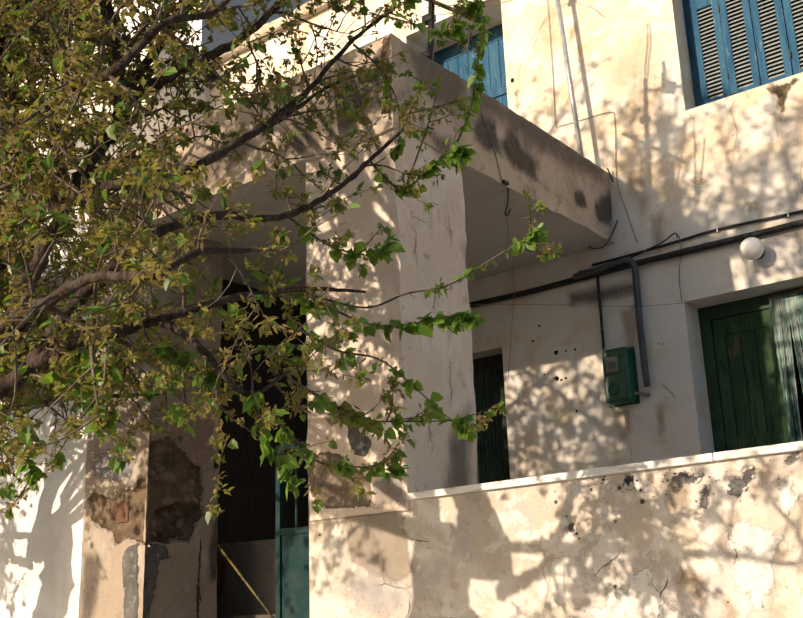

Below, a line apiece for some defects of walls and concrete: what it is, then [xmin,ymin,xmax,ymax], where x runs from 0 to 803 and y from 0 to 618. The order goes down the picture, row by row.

damp [767,78,797,112]
damp [475,92,602,178]
damp [575,192,586,207]
damp [596,193,612,223]
spalling [88,419,219,547]
spalling [308,451,405,509]
spalling [579,475,655,504]
spalling [650,461,759,518]